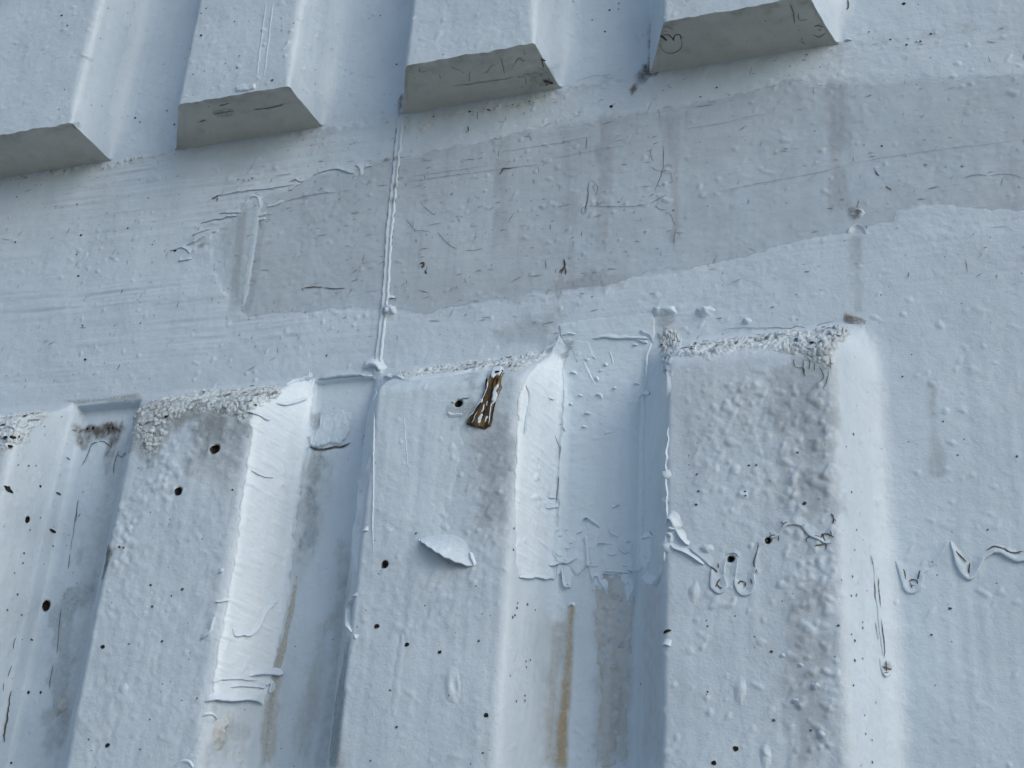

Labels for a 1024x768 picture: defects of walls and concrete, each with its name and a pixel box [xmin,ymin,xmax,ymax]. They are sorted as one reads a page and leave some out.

spalling [0,410,51,457]
peeling [132,371,352,720]
peeling [360,313,866,768]